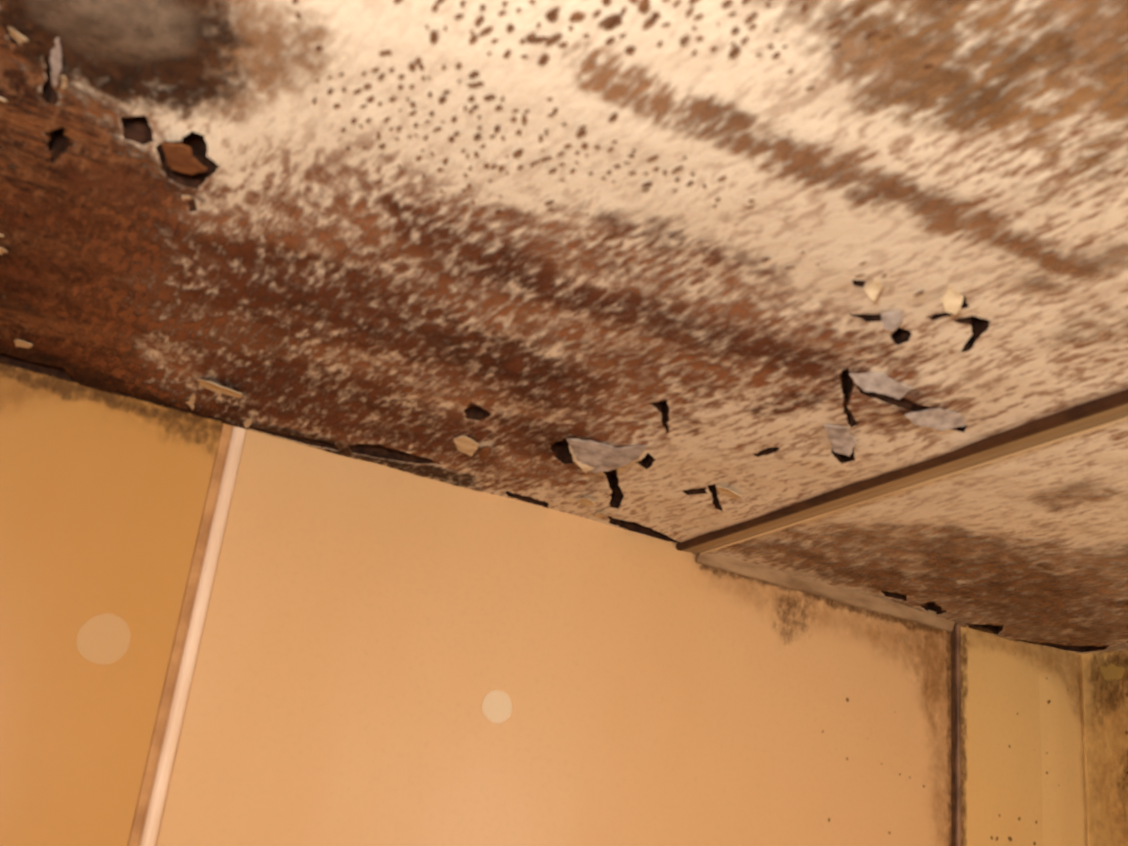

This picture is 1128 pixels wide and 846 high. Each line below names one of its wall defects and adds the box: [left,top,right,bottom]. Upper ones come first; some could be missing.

peeling [40,38,68,105]
peeling [44,127,74,163]
peeling [120,116,220,213]
leakage [0,0,974,491]
peeling [849,278,912,345]
peeling [927,285,991,352]
peeling [453,436,490,462]
peeling [550,438,655,519]
peeling [649,399,670,436]
peeling [681,484,740,512]
peeling [824,367,967,464]
leakage [728,523,1128,846]